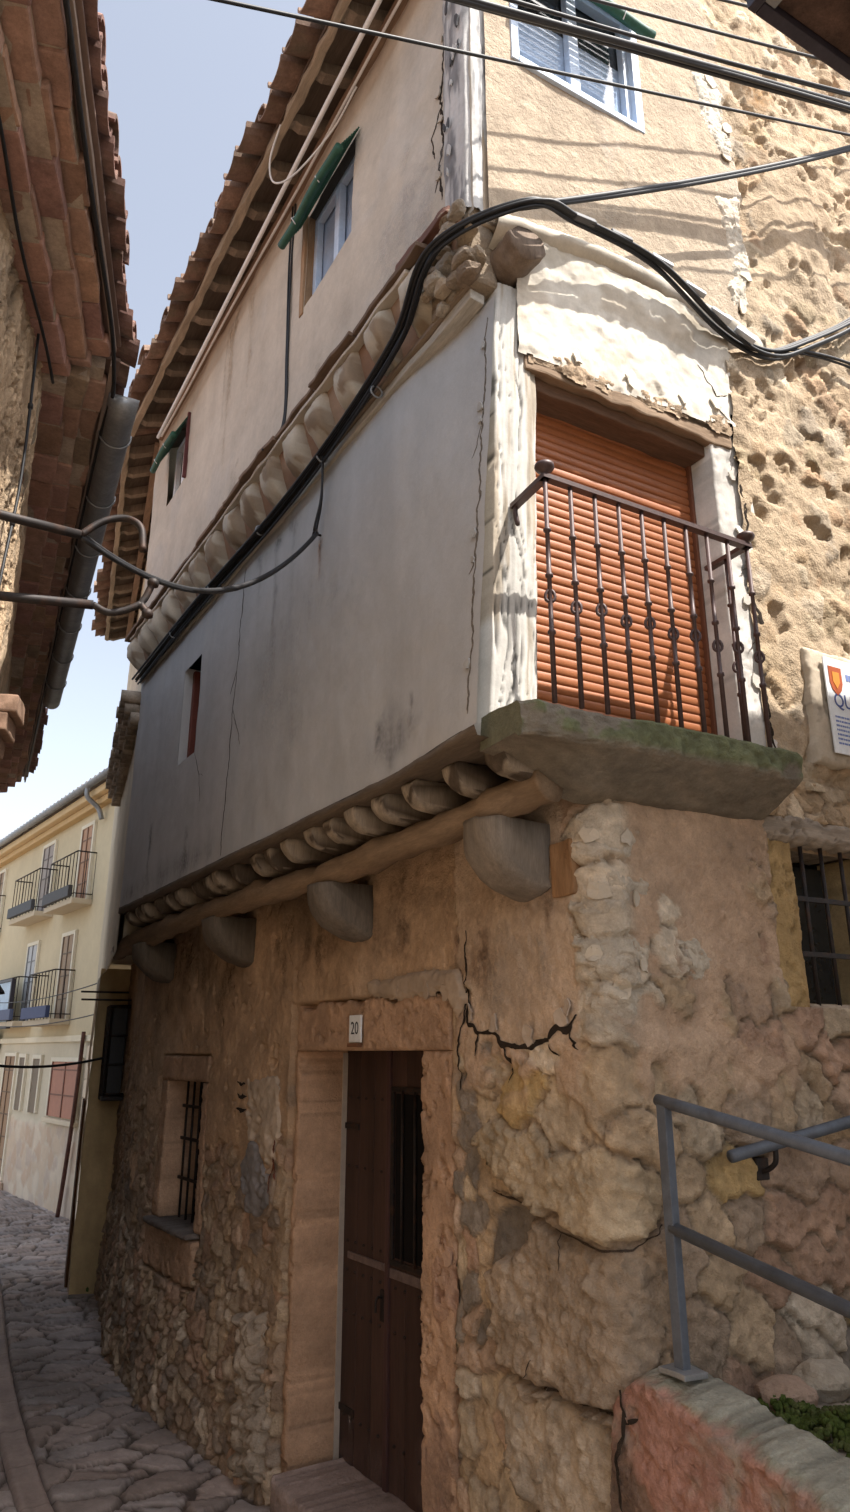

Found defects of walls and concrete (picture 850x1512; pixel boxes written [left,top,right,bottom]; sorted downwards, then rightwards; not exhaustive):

peeling [444,1,460,86]
peeling [443,117,451,176]
flaking render [714,196,752,315]
flaking render [528,349,733,436]
crack [457,930,578,1091]